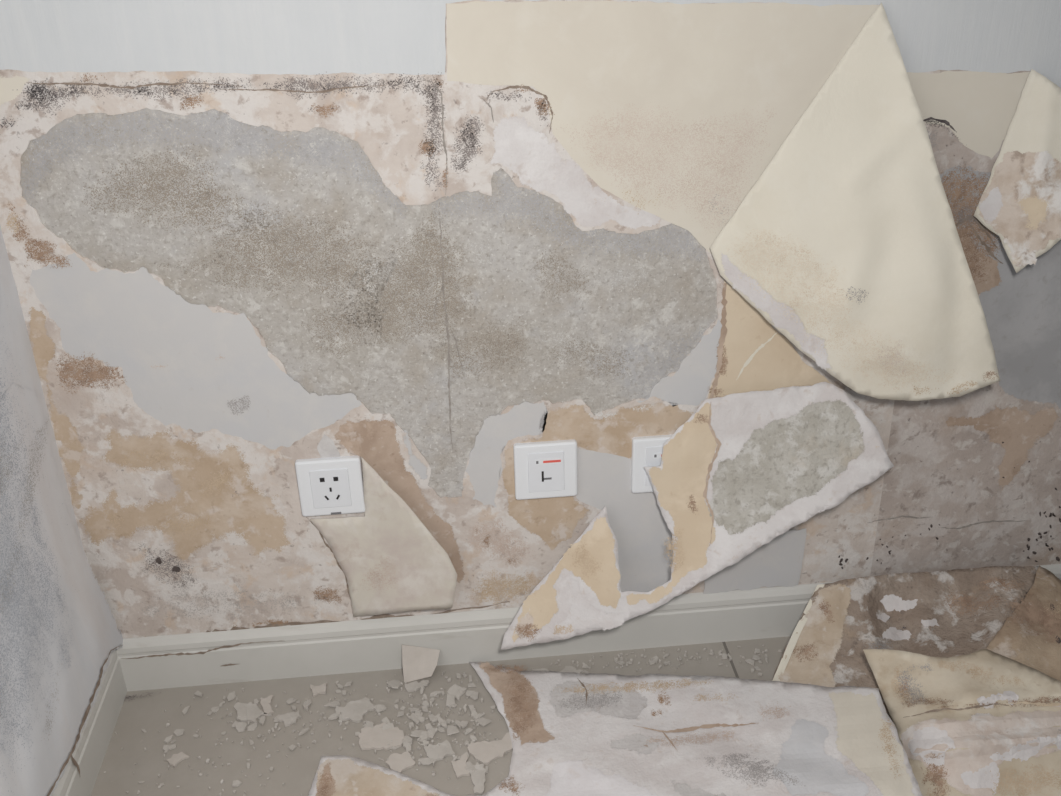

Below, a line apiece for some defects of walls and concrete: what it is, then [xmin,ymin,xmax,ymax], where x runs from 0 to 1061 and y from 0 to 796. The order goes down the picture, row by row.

spalling [20,108,832,594]
peeling [940,164,1061,490]
leakage [1023,506,1061,562]